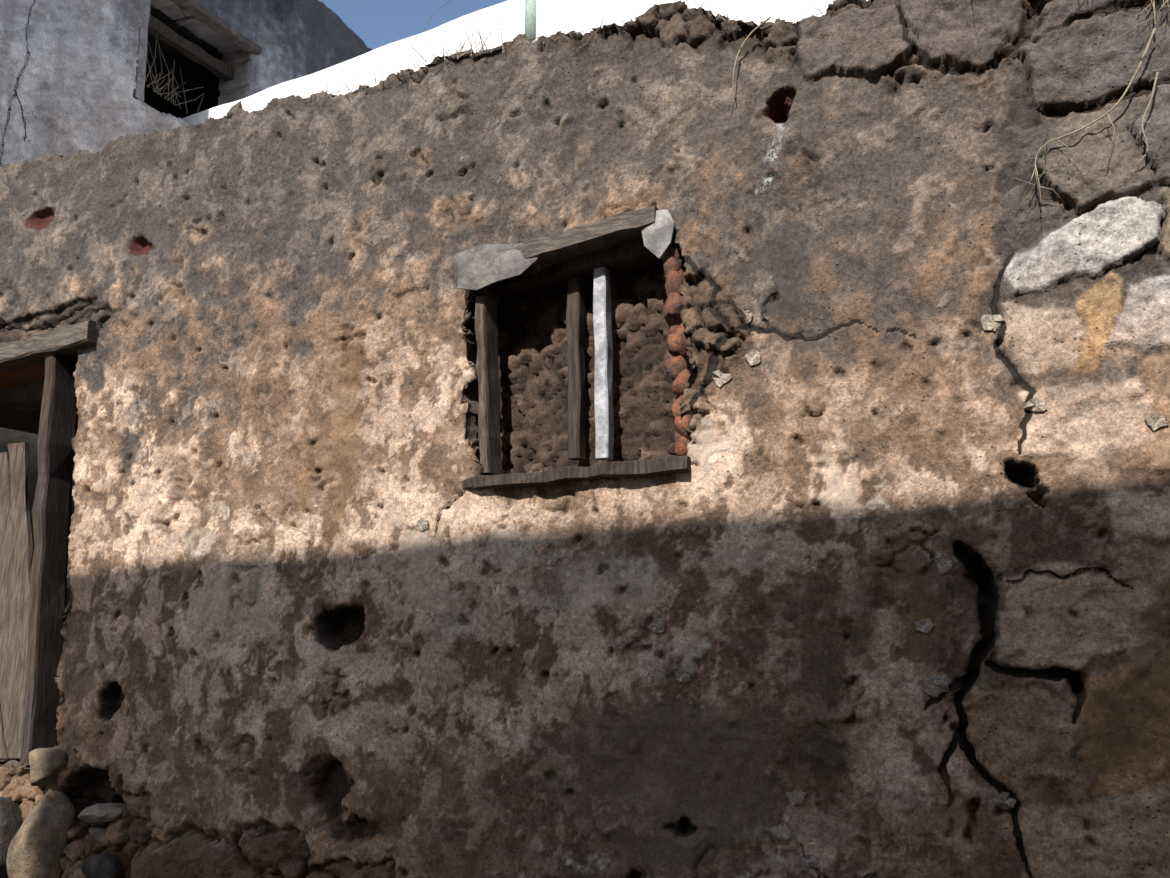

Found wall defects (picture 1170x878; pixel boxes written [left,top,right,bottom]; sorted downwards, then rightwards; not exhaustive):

crack [0,0,36,164]
crack [684,256,916,430]
crack [980,253,1048,454]
peeling [189,532,216,558]
peeling [381,517,489,639]
peeling [470,523,712,677]
peeling [687,421,734,487]
peeling [817,460,890,513]
flaking render [914,618,934,634]
crack [923,541,1134,878]
hole [313,759,378,841]
peeling [767,813,792,839]